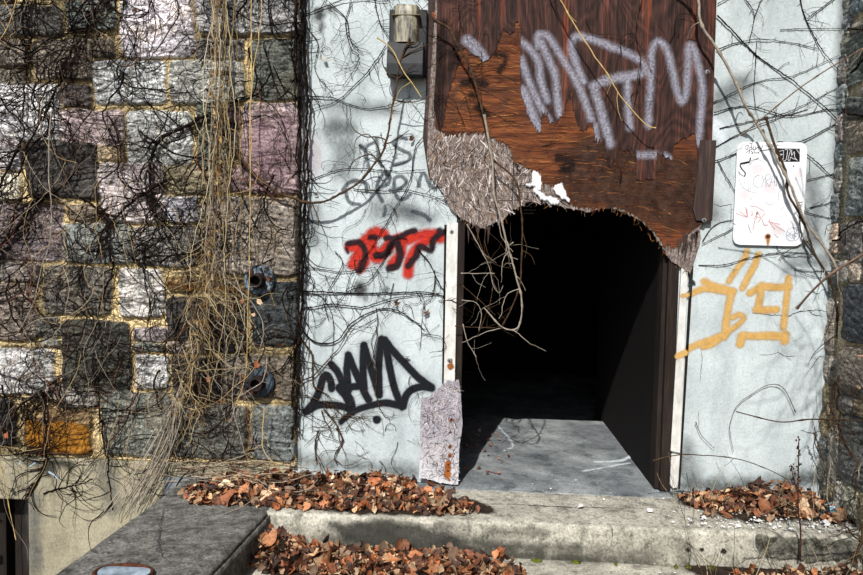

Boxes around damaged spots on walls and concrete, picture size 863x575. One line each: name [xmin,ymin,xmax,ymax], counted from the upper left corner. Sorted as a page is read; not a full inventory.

peeling [526,171,570,205]
rust [444,445,452,481]